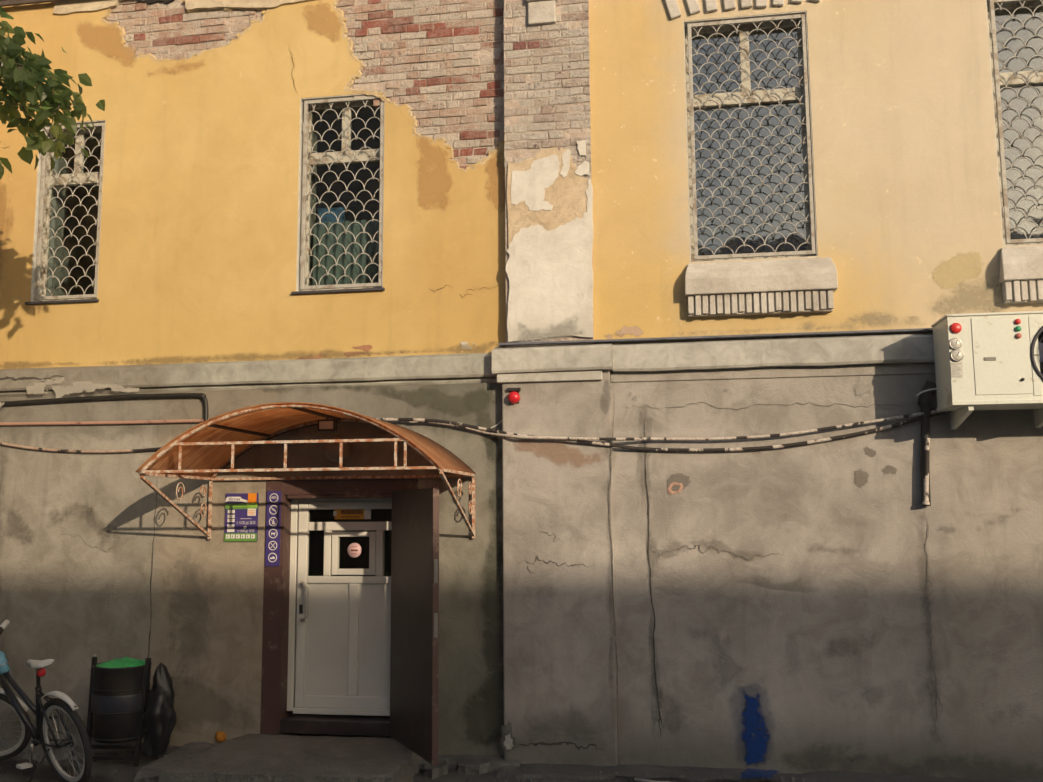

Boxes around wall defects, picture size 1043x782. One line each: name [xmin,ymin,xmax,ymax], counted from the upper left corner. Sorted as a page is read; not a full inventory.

peeling [101,0,268,62]
peeling [332,0,592,248]
leakage [419,139,451,208]
leakage [487,153,505,209]
crack [0,374,63,382]
peeling [26,378,139,398]
crack [516,402,918,750]
crack [924,512,943,748]